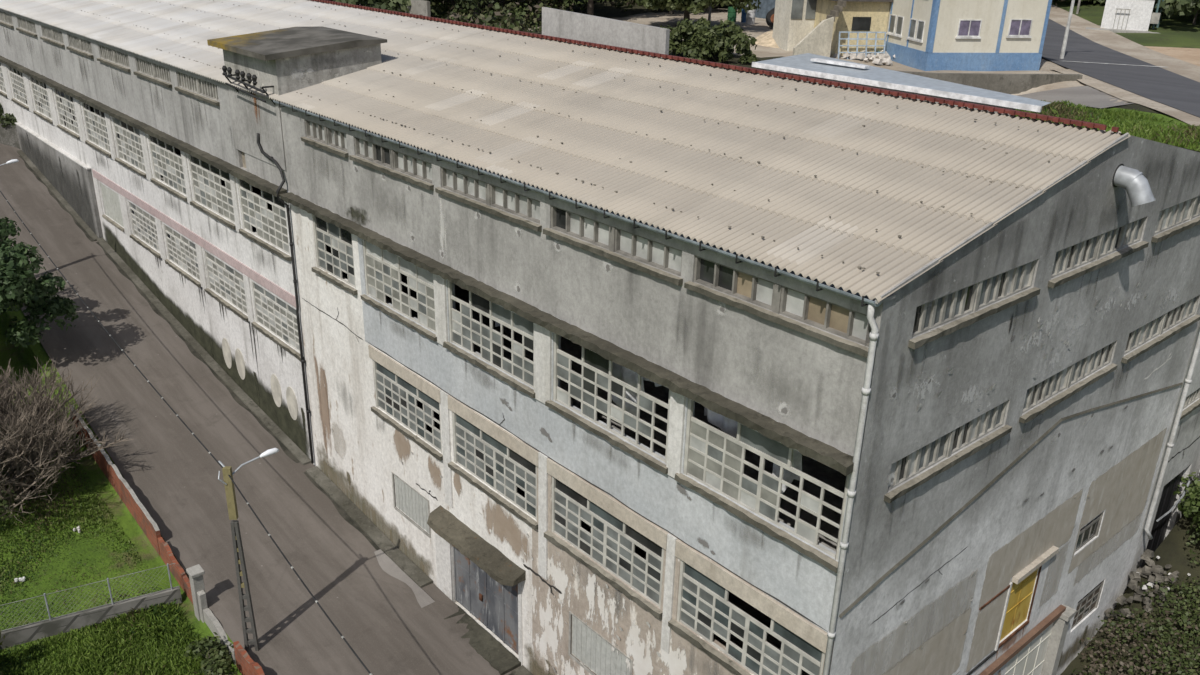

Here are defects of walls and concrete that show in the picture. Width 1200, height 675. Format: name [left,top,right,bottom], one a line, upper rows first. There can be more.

damp [249,323,260,404]
peeling [392,429,413,467]
peeling [428,457,462,495]
peeling [479,500,533,562]
peeling [527,556,687,675]